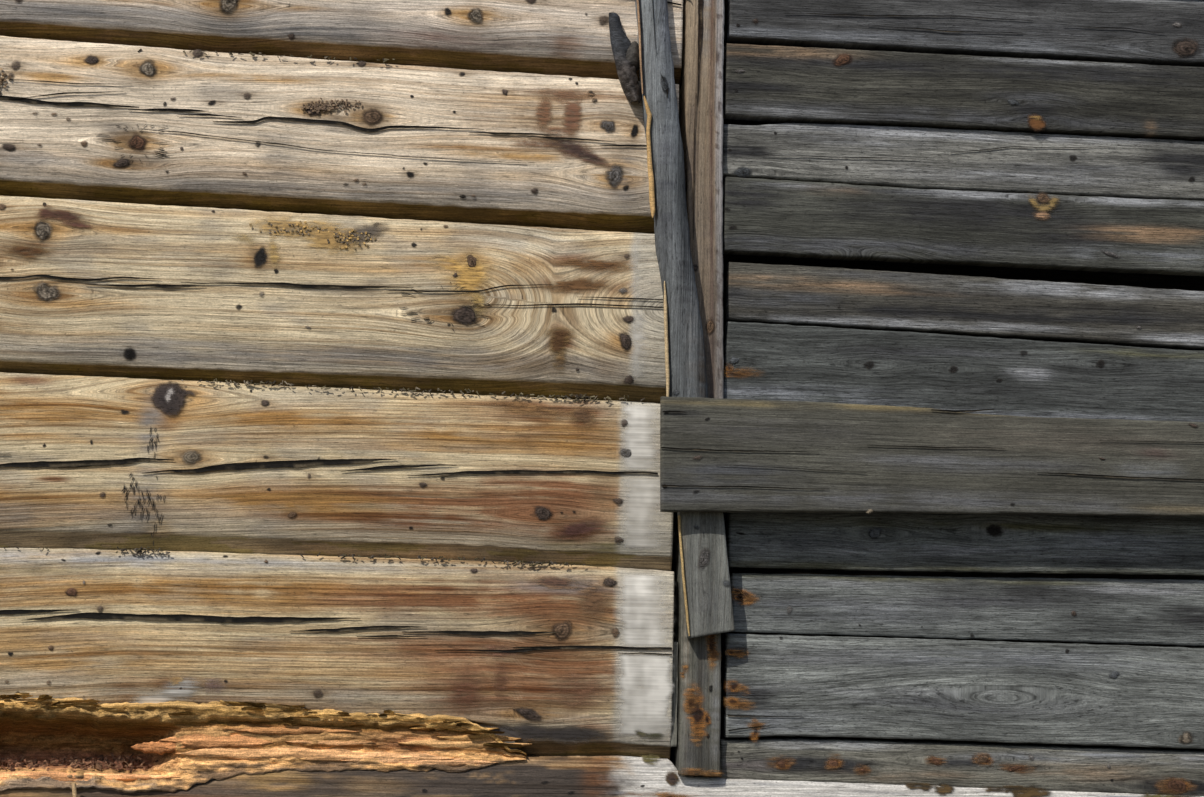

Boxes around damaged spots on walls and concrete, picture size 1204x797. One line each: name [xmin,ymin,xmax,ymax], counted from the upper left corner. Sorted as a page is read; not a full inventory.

crack [0,79,647,163]
crack [652,0,703,238]
crack [0,445,1005,489]
crack [0,609,672,655]
peeling [0,693,128,713]
peeling [220,700,522,748]
corrosion [680,665,711,742]